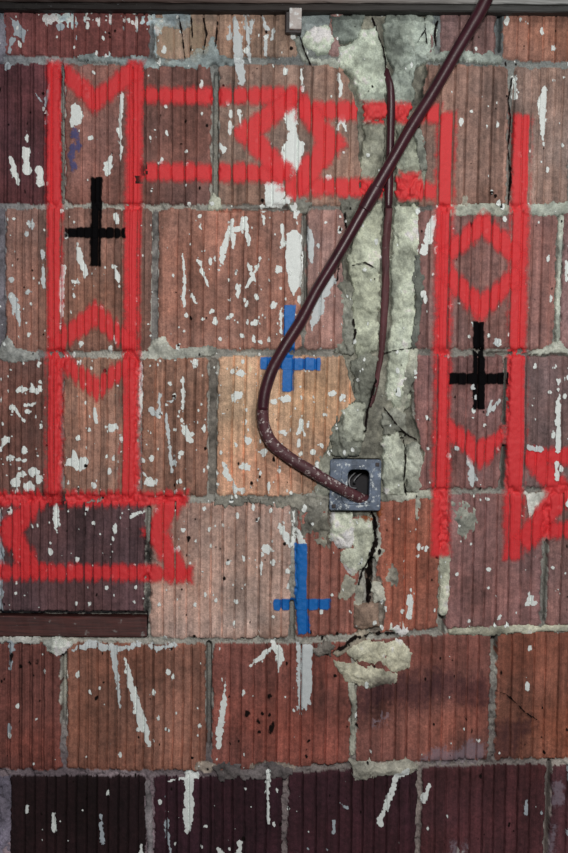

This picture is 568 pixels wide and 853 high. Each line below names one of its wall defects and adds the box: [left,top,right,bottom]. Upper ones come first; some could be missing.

crack [358,515,378,603]
crack [327,631,395,655]